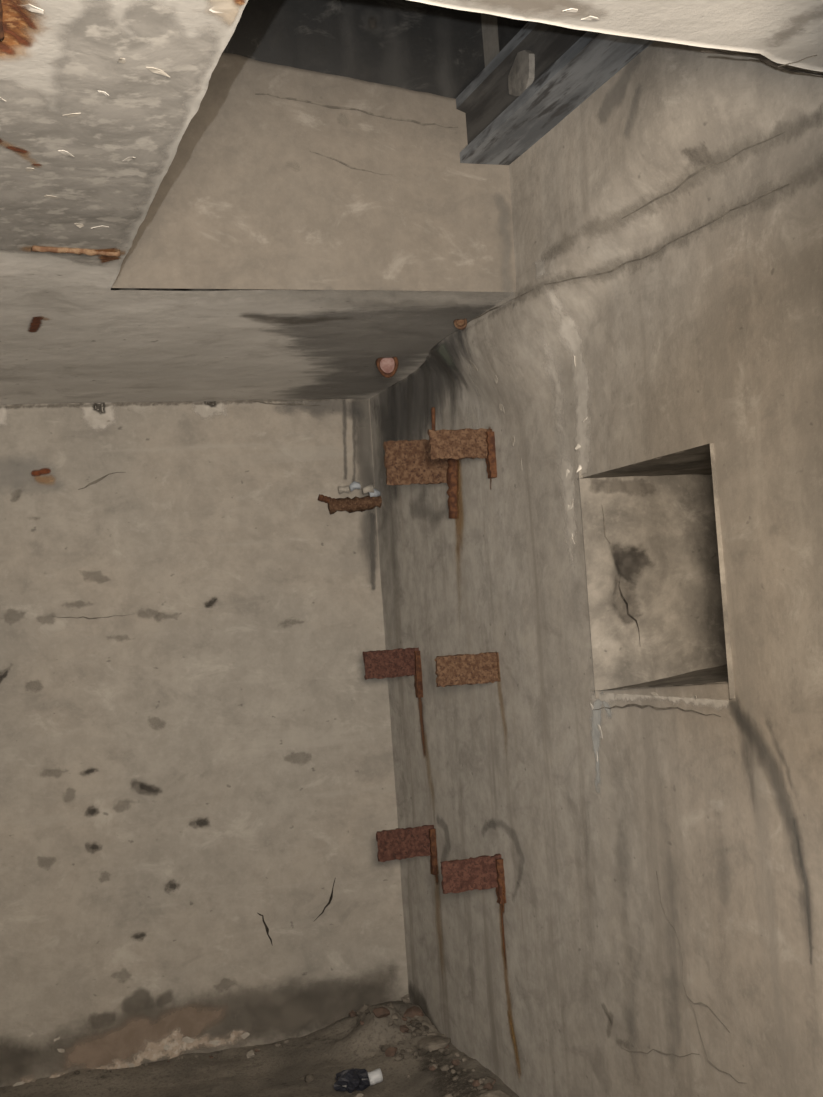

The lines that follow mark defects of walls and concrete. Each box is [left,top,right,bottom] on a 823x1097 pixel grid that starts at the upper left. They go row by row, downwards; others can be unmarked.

rust [0,0,44,58]
spalling [209,0,240,25]
crack [701,50,823,76]
rust [0,139,41,166]
crack [552,114,819,253]
crack [467,162,823,323]
leakage [245,315,332,324]
leakage [364,509,376,589]
rust [500,882,521,1073]
leakage [0,990,175,1086]
peeling [27,1006,224,1075]
leakage [95,972,392,1069]